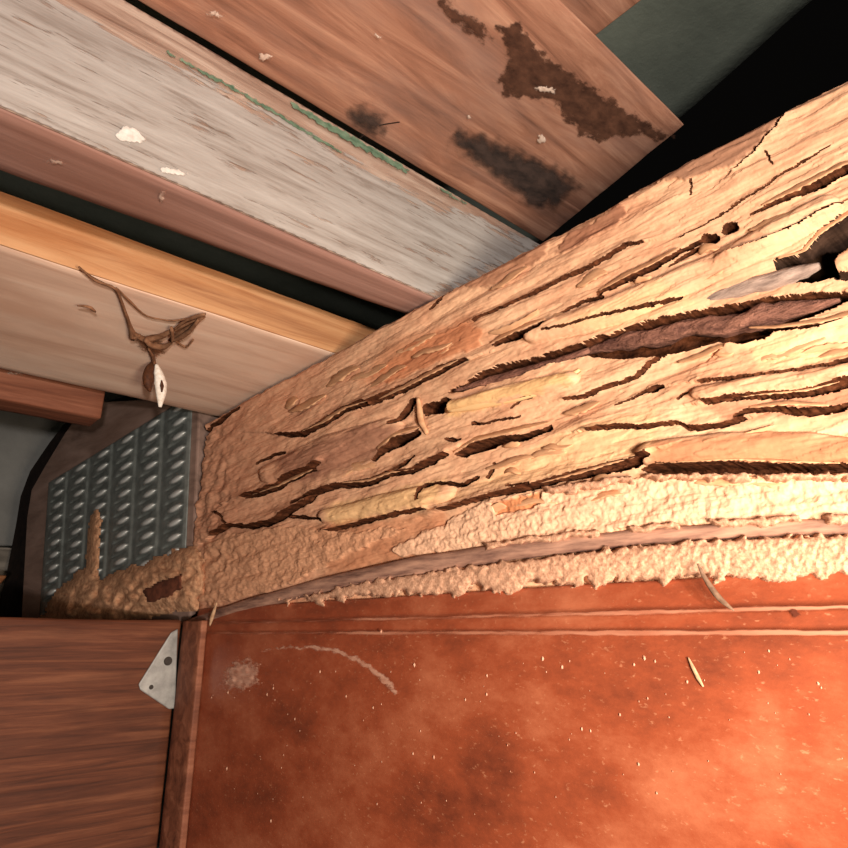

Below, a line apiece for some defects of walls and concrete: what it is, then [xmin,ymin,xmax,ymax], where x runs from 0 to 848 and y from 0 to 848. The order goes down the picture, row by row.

leakage [438,0,674,143]
leakage [454,131,574,207]
crack [678,115,831,238]
crack [731,198,848,249]
crack [429,291,452,310]
crack [471,240,644,322]
crack [744,311,848,344]
crack [207,356,848,535]